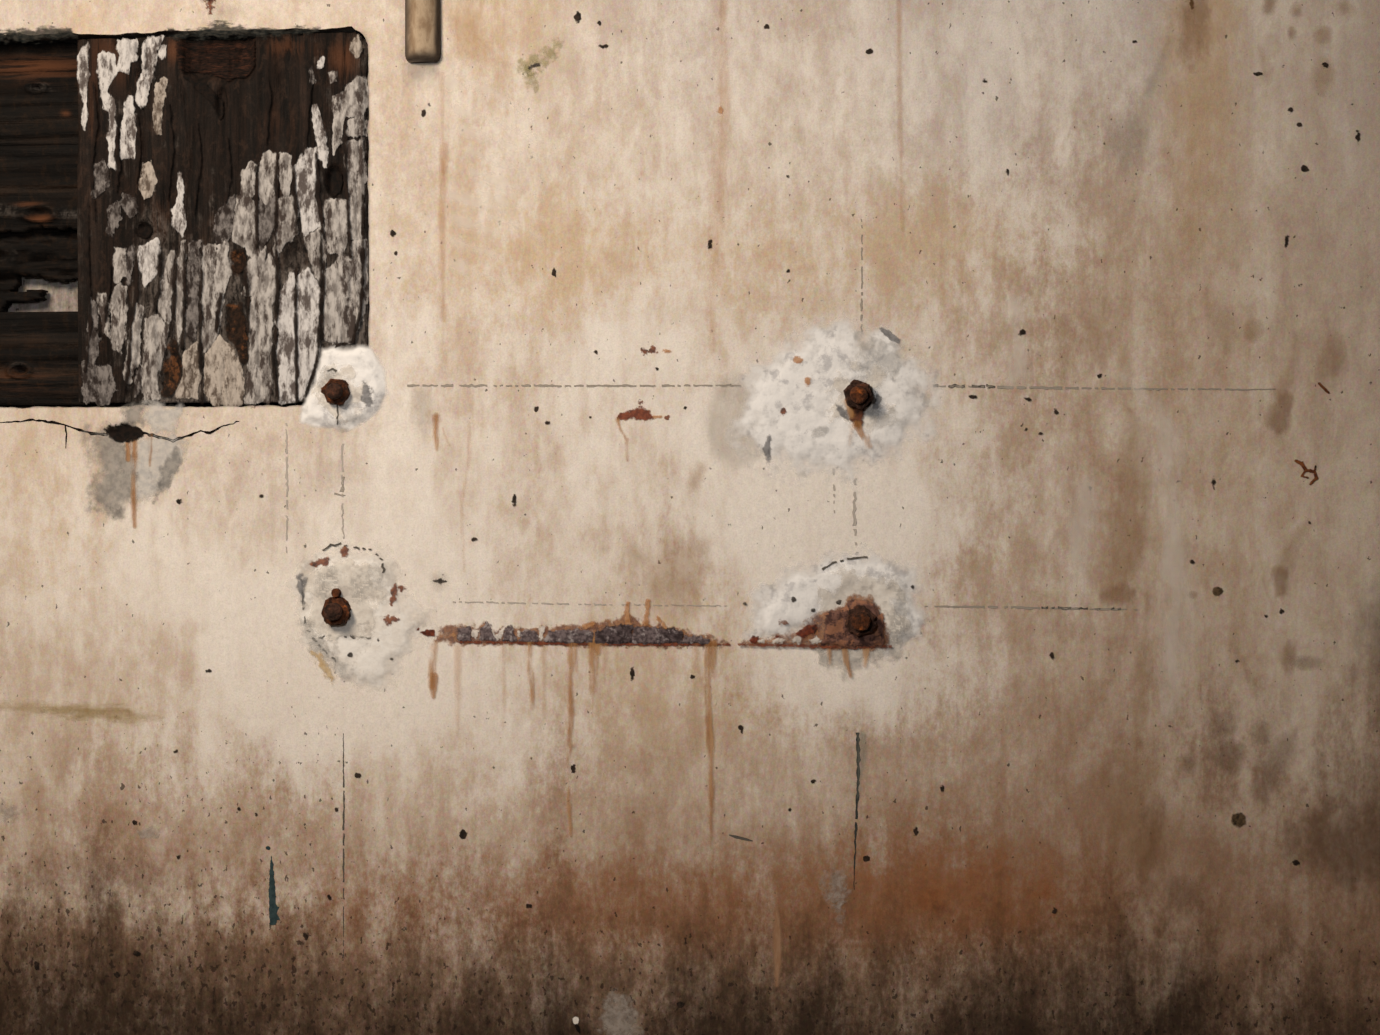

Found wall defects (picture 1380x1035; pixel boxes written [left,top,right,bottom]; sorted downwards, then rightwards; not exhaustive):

peeling [77,35,369,527]
spalling [879,328,900,343]
crack [0,418,108,448]
crack [143,421,239,442]
rust [617,401,670,427]
rust [845,400,864,437]
peeling [762,436,771,461]
rust [417,594,892,735]